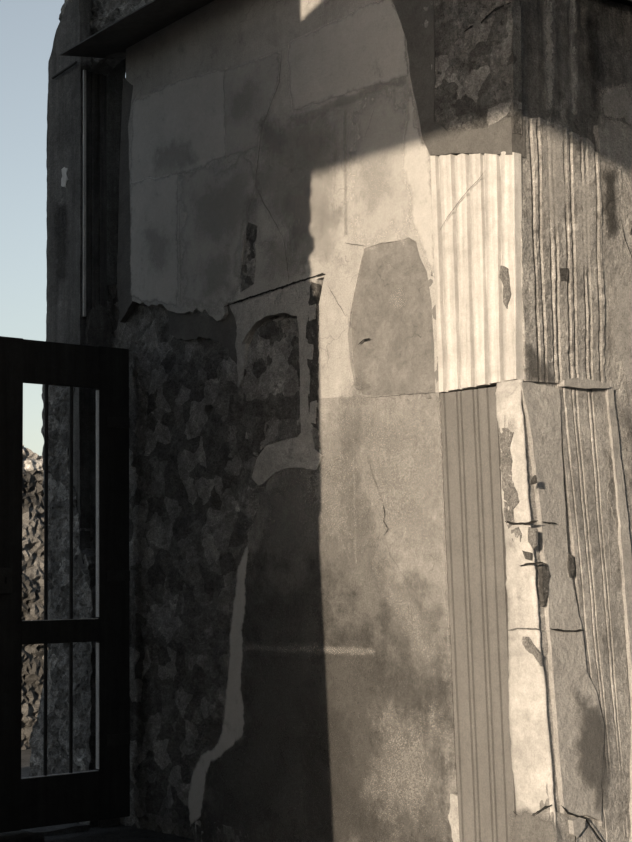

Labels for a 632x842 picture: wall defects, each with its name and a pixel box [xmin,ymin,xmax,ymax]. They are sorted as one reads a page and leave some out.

spalling [240,222,257,291]
spalling [304,282,321,430]
crack [513,804,603,842]